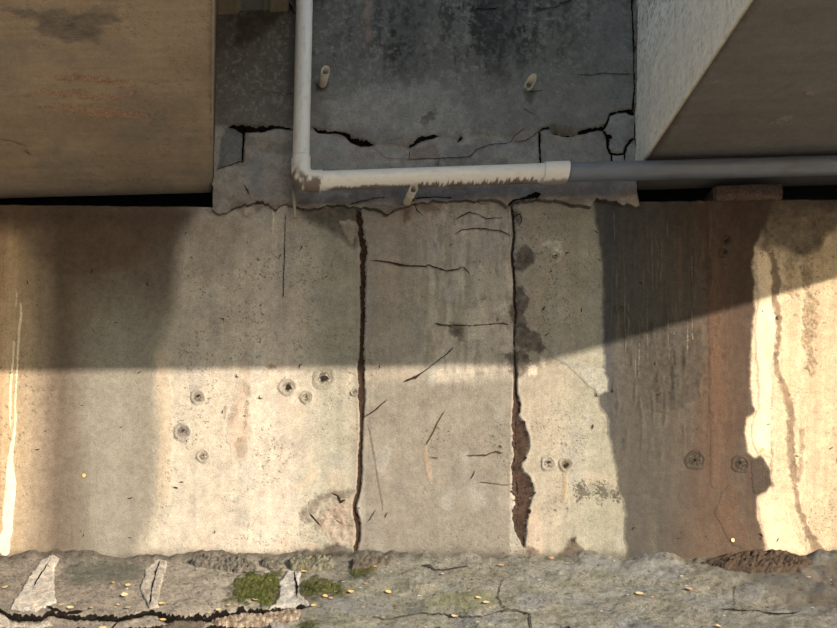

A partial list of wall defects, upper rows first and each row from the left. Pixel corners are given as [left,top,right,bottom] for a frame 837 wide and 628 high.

leakage [0,0,123,48]
crack [218,125,293,169]
crack [313,0,636,163]
peeling [547,123,579,137]
leakage [0,205,369,558]
crack [309,197,470,552]
crack [413,192,541,547]
leakage [568,199,837,615]
crack [0,561,306,628]
spalling [298,487,359,547]